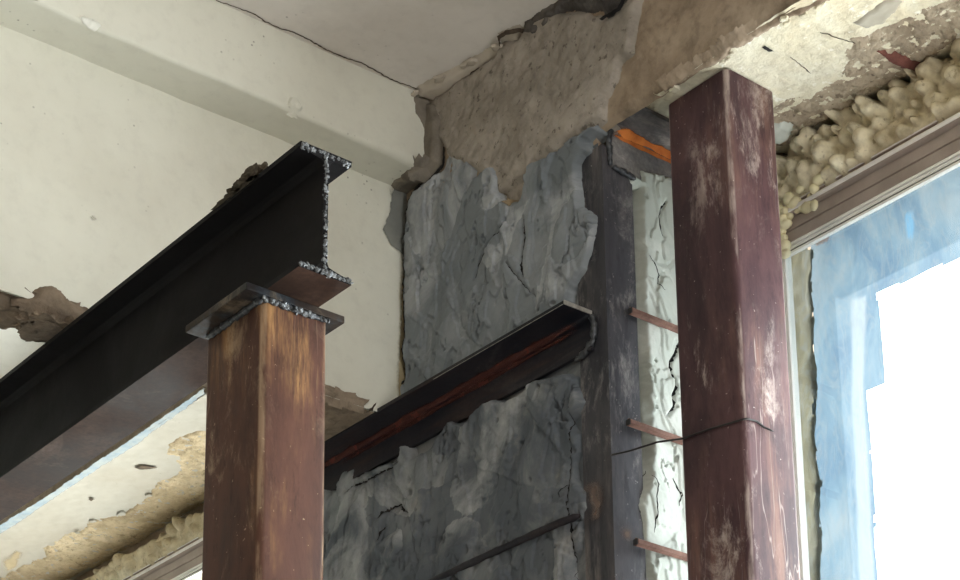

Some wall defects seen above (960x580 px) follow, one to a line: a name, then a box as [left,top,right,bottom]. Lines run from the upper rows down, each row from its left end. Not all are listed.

crack [216,0,418,90]
flaking render [391,0,644,202]
flaking render [655,0,830,93]
flaking render [773,0,960,147]
flaking render [0,286,88,343]
corrosion [324,327,570,469]
crack [668,344,679,414]
peeling [0,431,206,580]
crack [640,471,683,533]